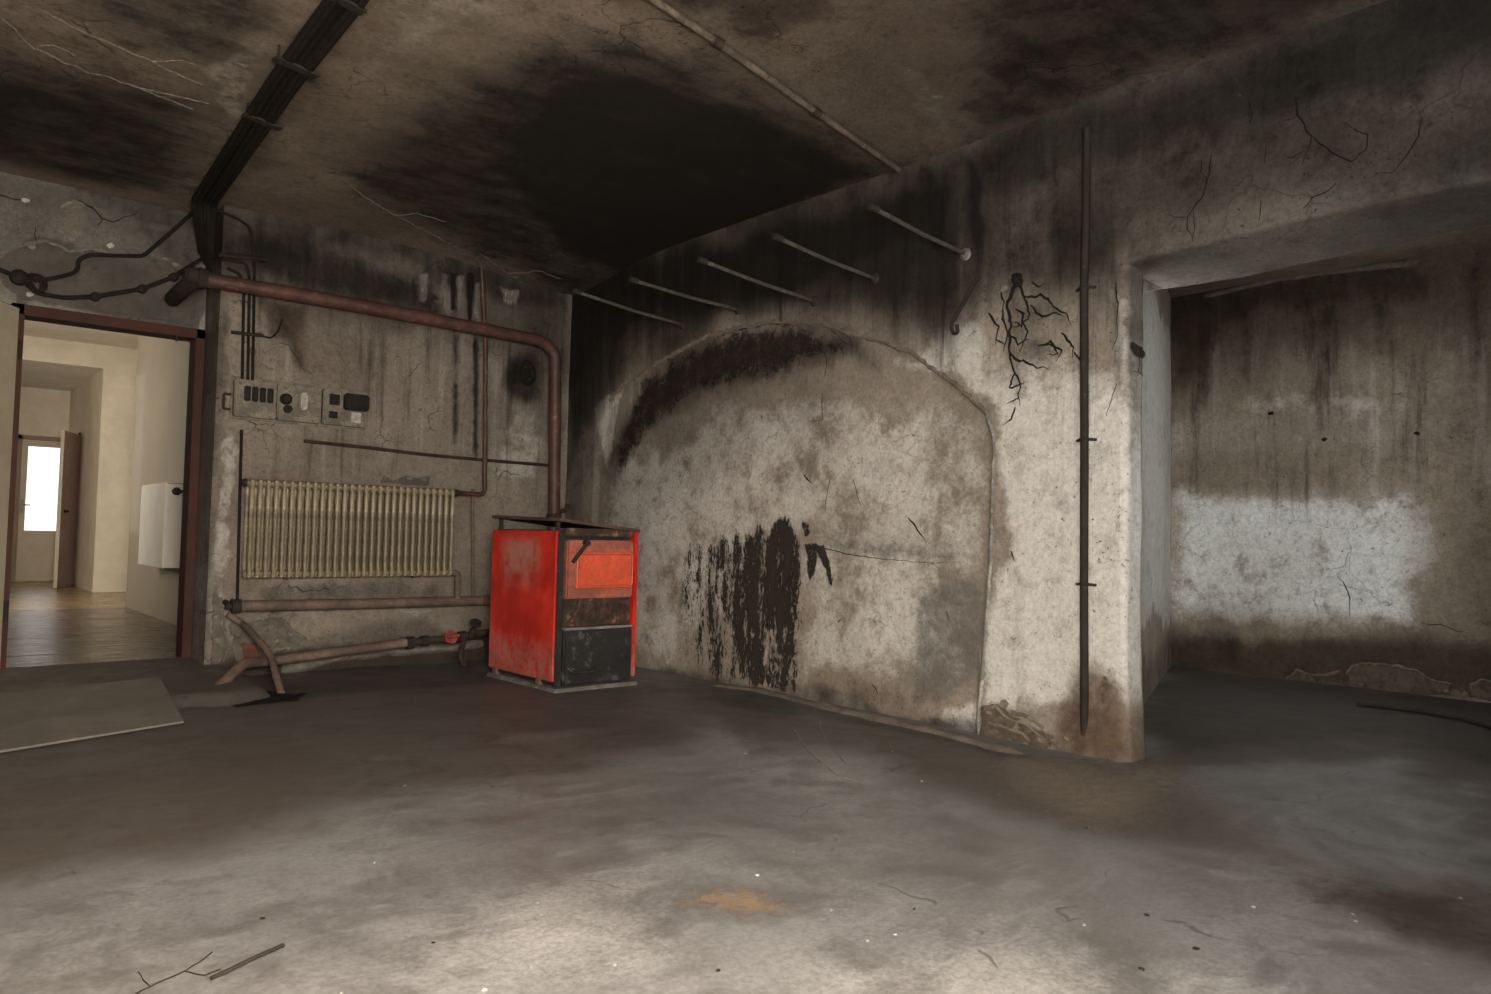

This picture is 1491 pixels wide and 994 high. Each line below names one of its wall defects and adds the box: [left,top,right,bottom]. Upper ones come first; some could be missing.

crack [0,10,209,110]
crack [1249,96,1422,208]
crack [988,273,1143,426]
flaking render [609,318,1073,749]
flaking render [1285,662,1468,696]